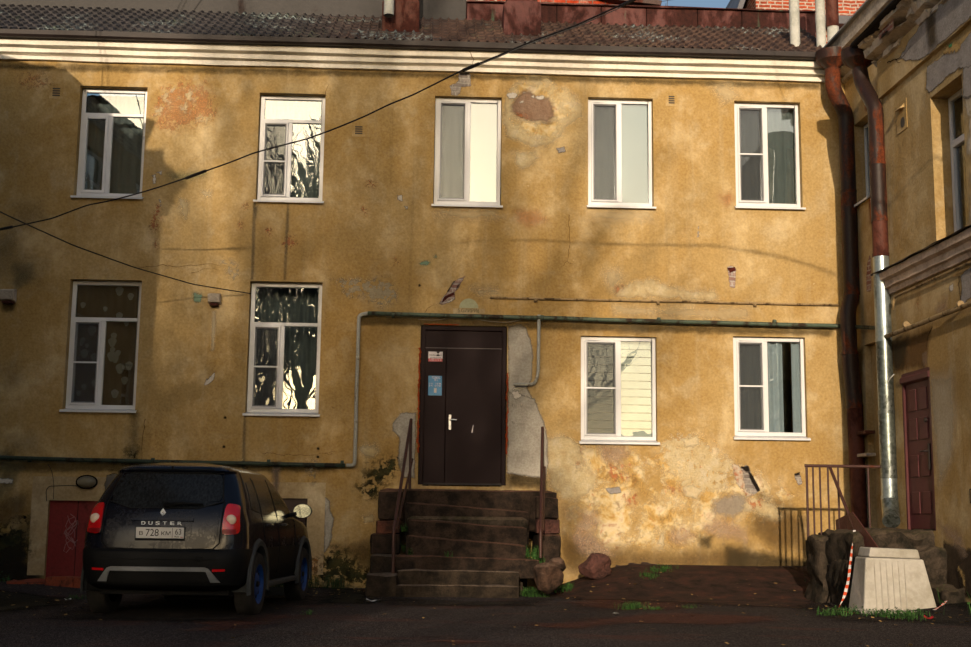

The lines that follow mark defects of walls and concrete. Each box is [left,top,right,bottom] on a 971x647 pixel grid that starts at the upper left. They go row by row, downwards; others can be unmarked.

peeling [503,75,582,168]
peeling [899,0,971,155]
peeling [393,412,416,478]
peeling [507,326,790,553]